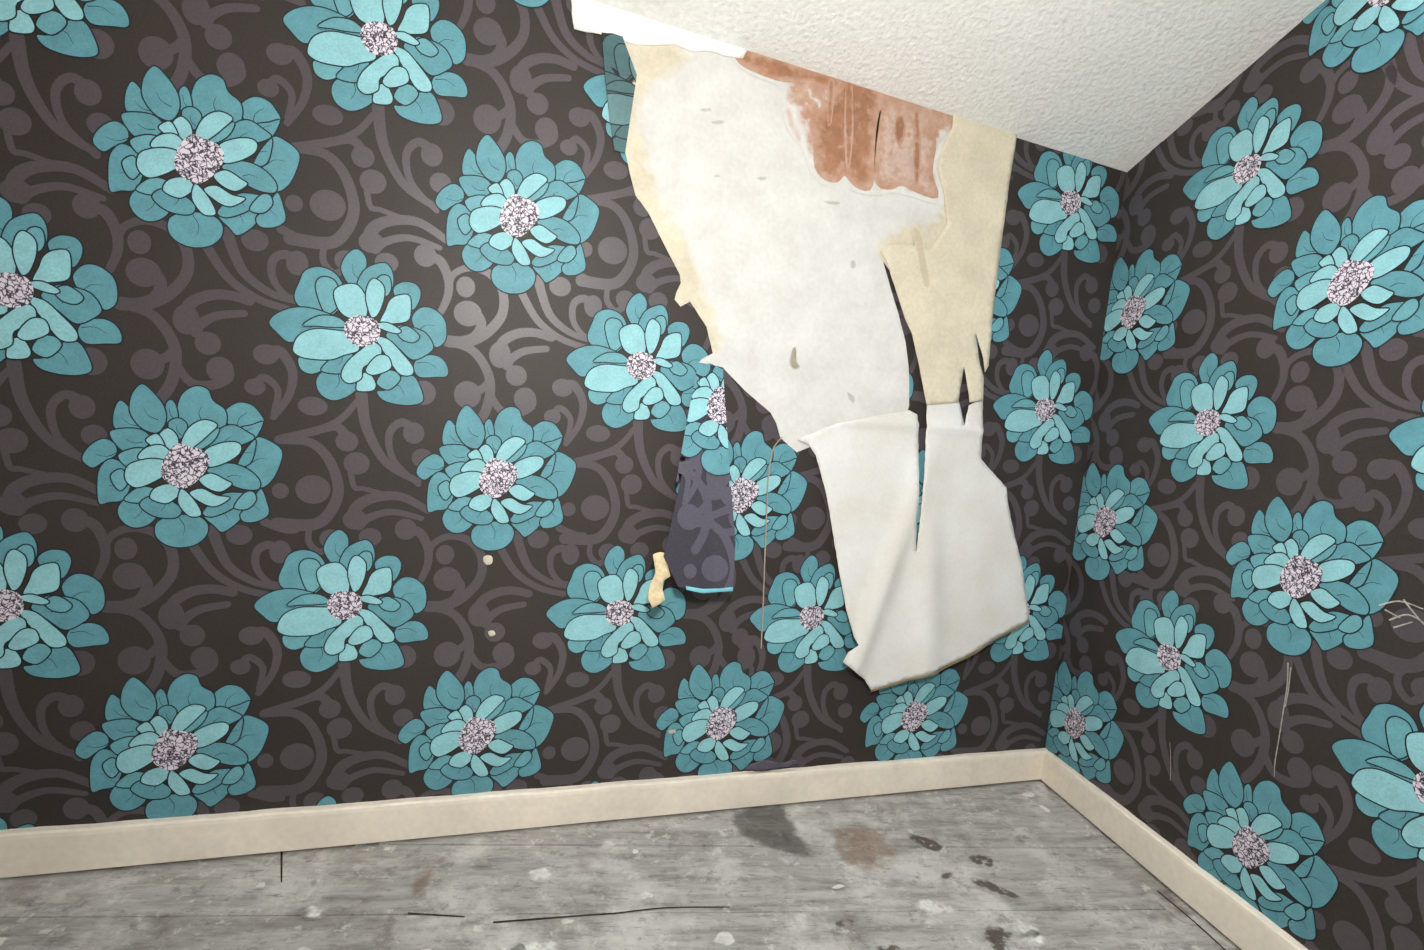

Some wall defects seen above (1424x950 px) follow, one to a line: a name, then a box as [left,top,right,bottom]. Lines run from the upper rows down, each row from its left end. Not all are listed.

flaking render [571,0,944,452]
water stain [732,50,953,204]